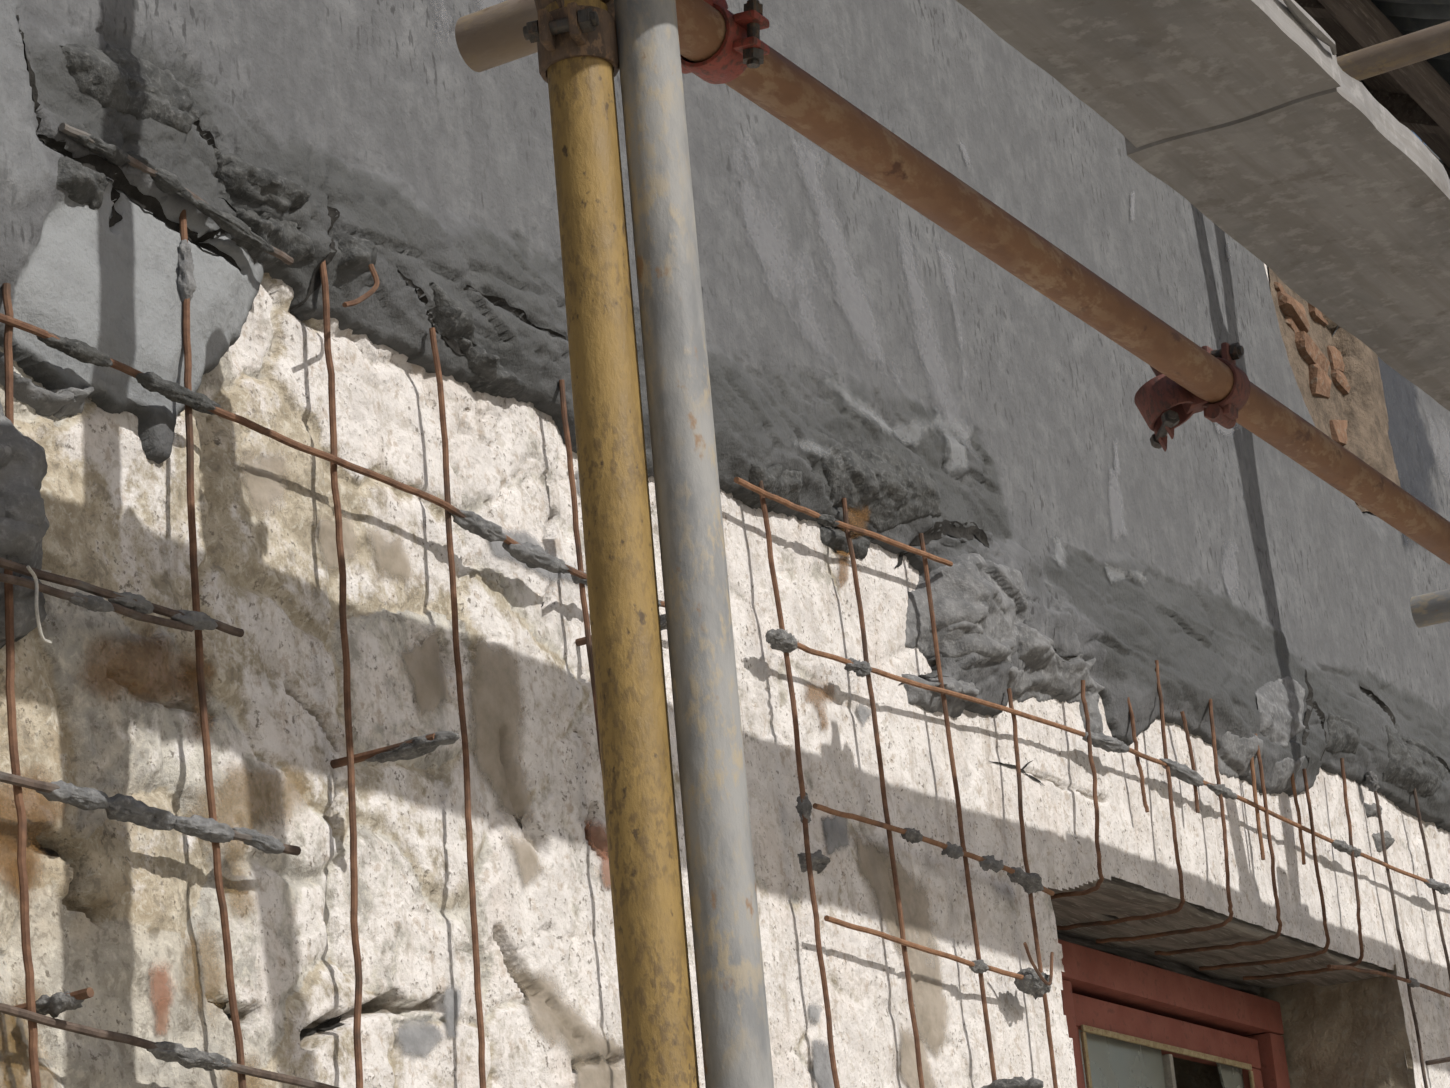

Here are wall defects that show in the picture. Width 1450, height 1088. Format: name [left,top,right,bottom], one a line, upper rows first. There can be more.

crack [16,15,241,271]
crack [290,206,340,312]
crack [397,267,465,355]
crack [466,285,566,340]
spalling [1268,267,1400,487]
peeling [315,519,411,580]
corrosion [840,509,868,586]
corrosion [0,787,59,892]
corrosion [584,823,611,886]
corrosion [152,967,172,1033]
peeling [512,967,626,1088]
peeling [858,838,947,1088]